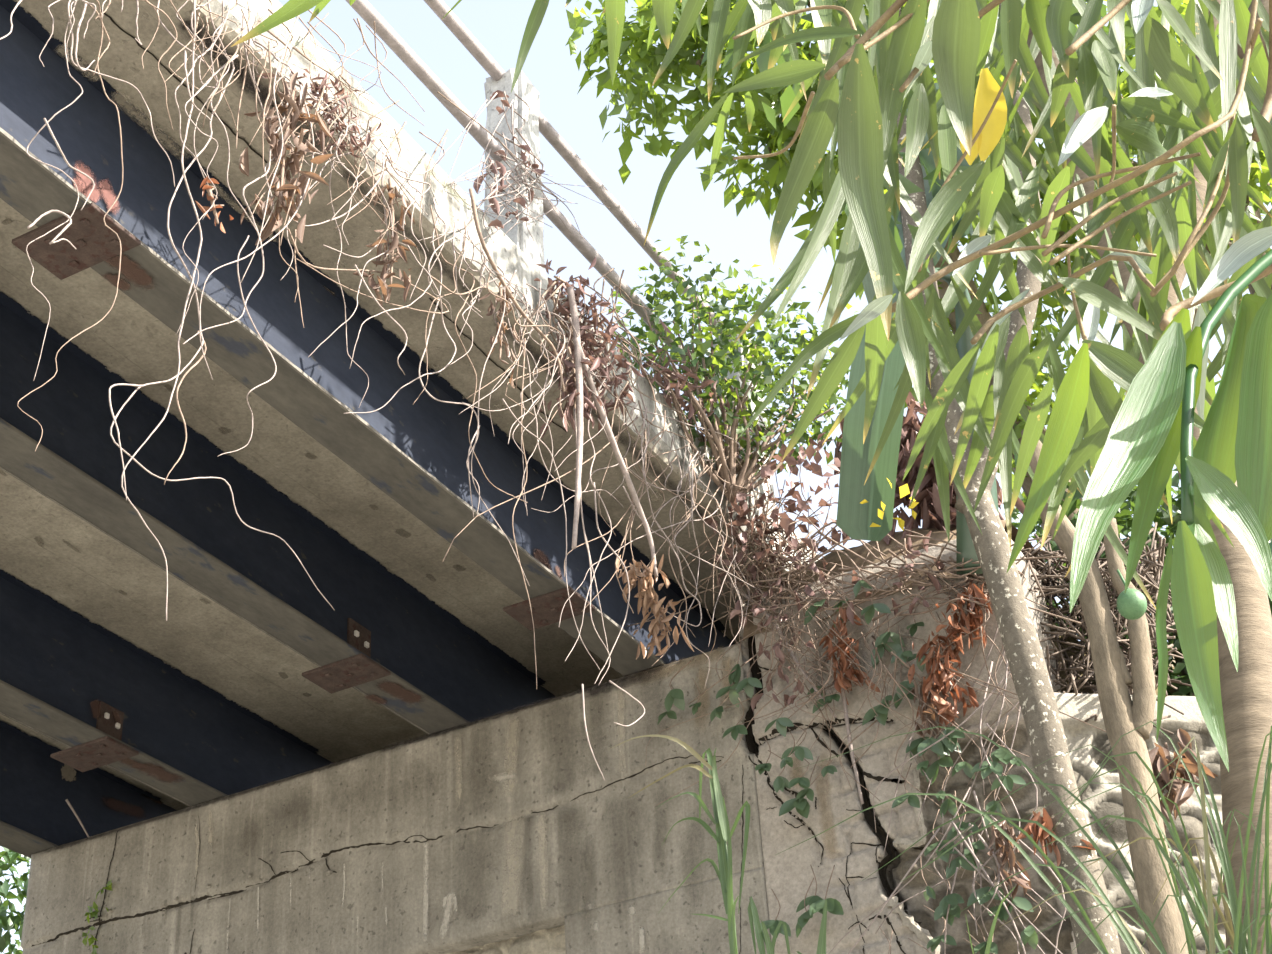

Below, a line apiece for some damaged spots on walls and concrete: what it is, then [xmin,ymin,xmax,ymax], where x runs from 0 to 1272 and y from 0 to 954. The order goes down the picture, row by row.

crack [101,9,268,163]
rust [74,163,119,213]
rust [103,254,152,290]
peeling [61,764,77,782]
leakage [50,756,358,868]
crack [31,635,924,954]
leakage [383,661,680,792]